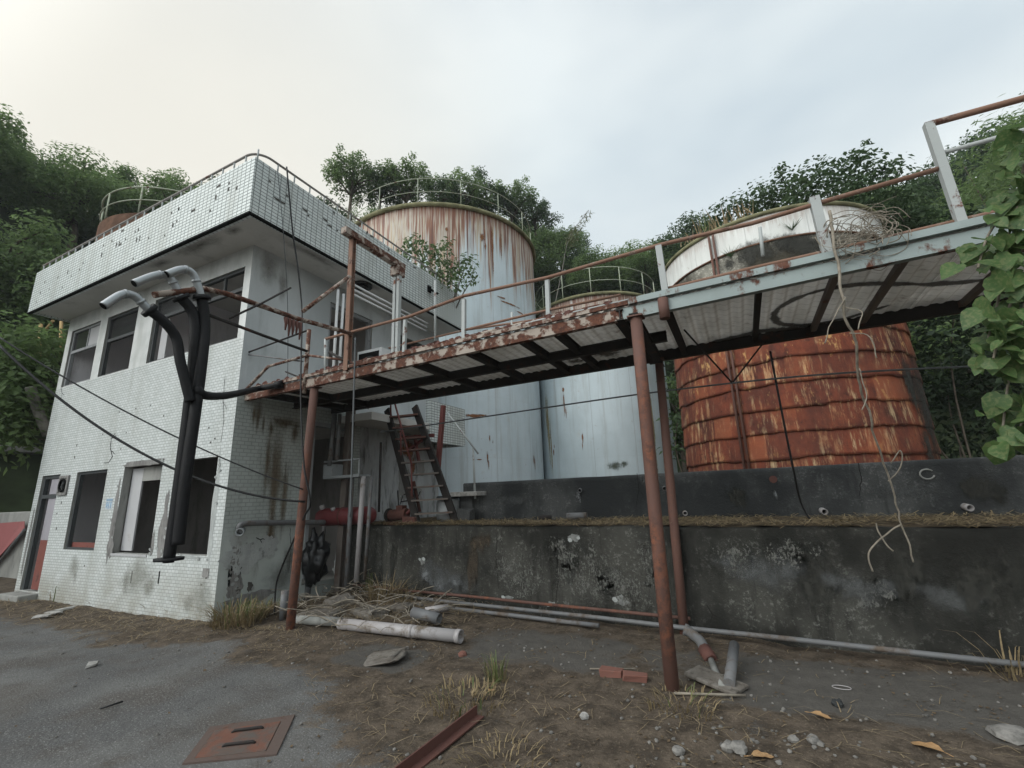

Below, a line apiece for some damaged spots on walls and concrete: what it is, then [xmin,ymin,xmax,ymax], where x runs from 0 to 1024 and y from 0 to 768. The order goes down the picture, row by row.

rust [480,226,502,272]
spalling [106,458,164,564]
peeling [176,427,279,611]
peeling [488,534,654,607]